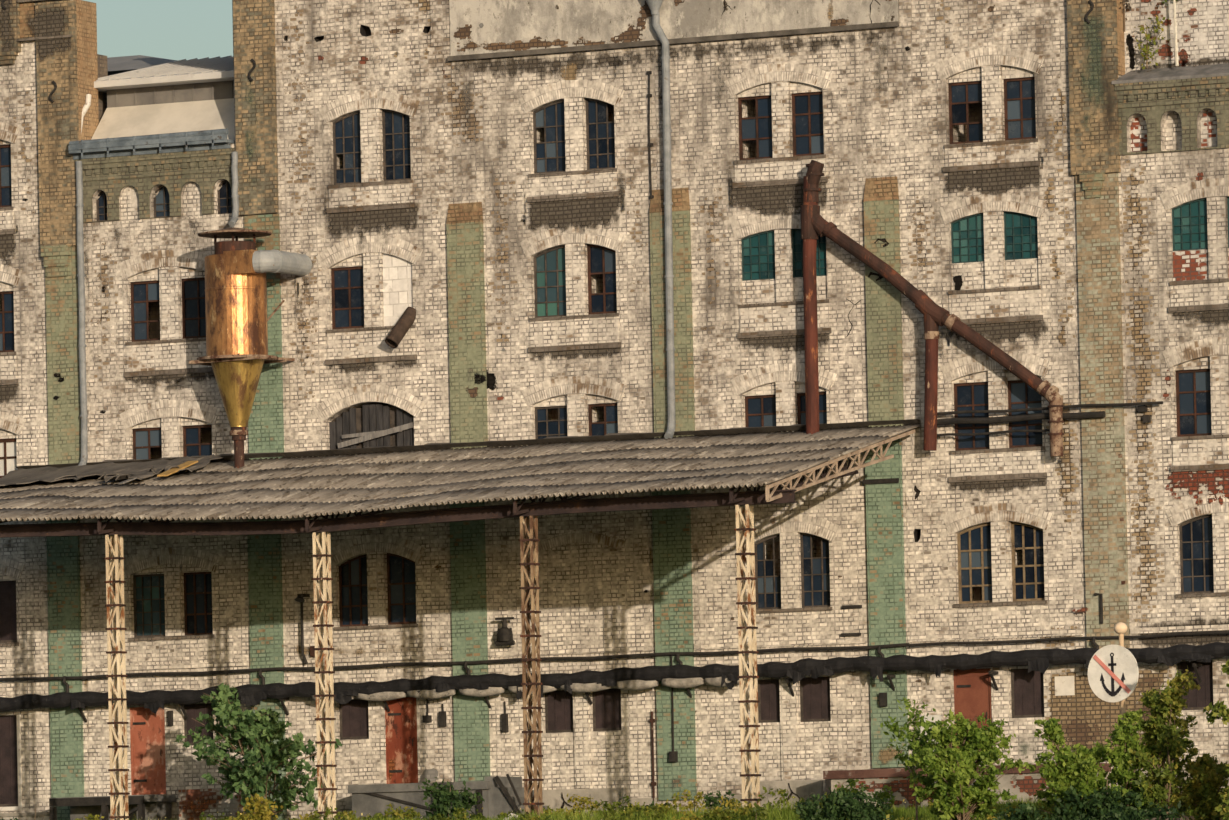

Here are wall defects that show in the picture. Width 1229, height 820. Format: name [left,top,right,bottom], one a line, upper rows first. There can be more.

spalling [1142,0,1172,26]
flaking render [408,0,652,145]
spalling [1125,18,1135,70]
spalling [1158,36,1196,67]
peeling [1119,160,1229,622]
spalling [856,777,936,808]